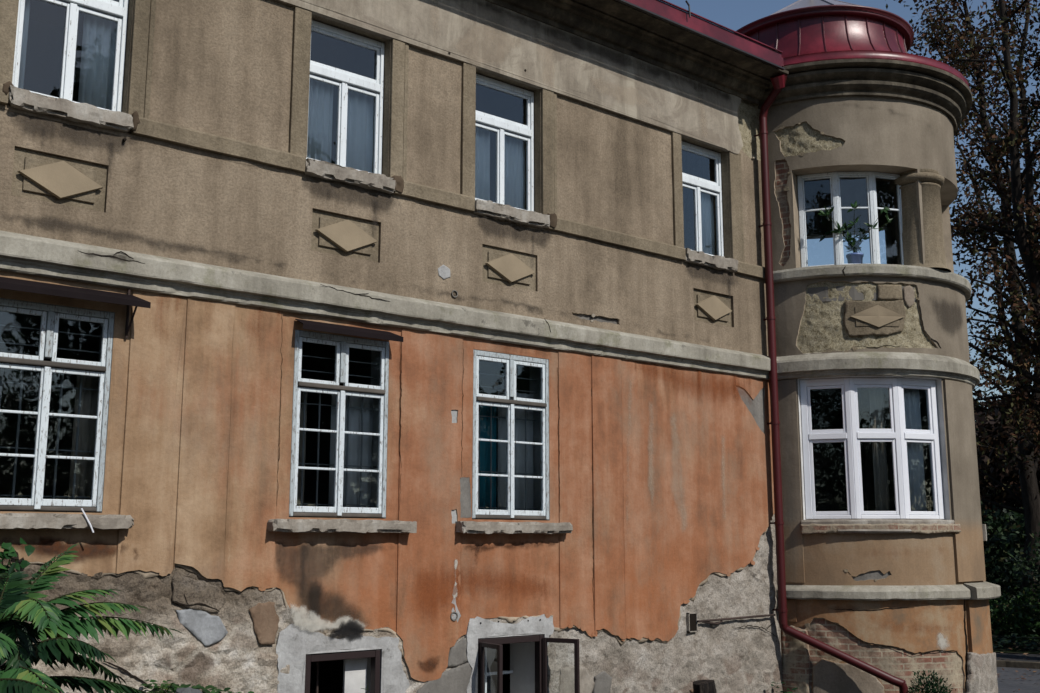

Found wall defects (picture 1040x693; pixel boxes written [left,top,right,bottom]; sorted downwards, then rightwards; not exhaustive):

flaking render [738,99,761,161]
flaking render [774,122,845,267]
crack [79,251,145,264]
flaking render [797,281,936,354]
flaking render [0,558,296,693]
leakage [283,546,364,632]
flaking render [363,627,428,693]
flaking render [450,597,461,622]
flaking render [485,513,998,693]